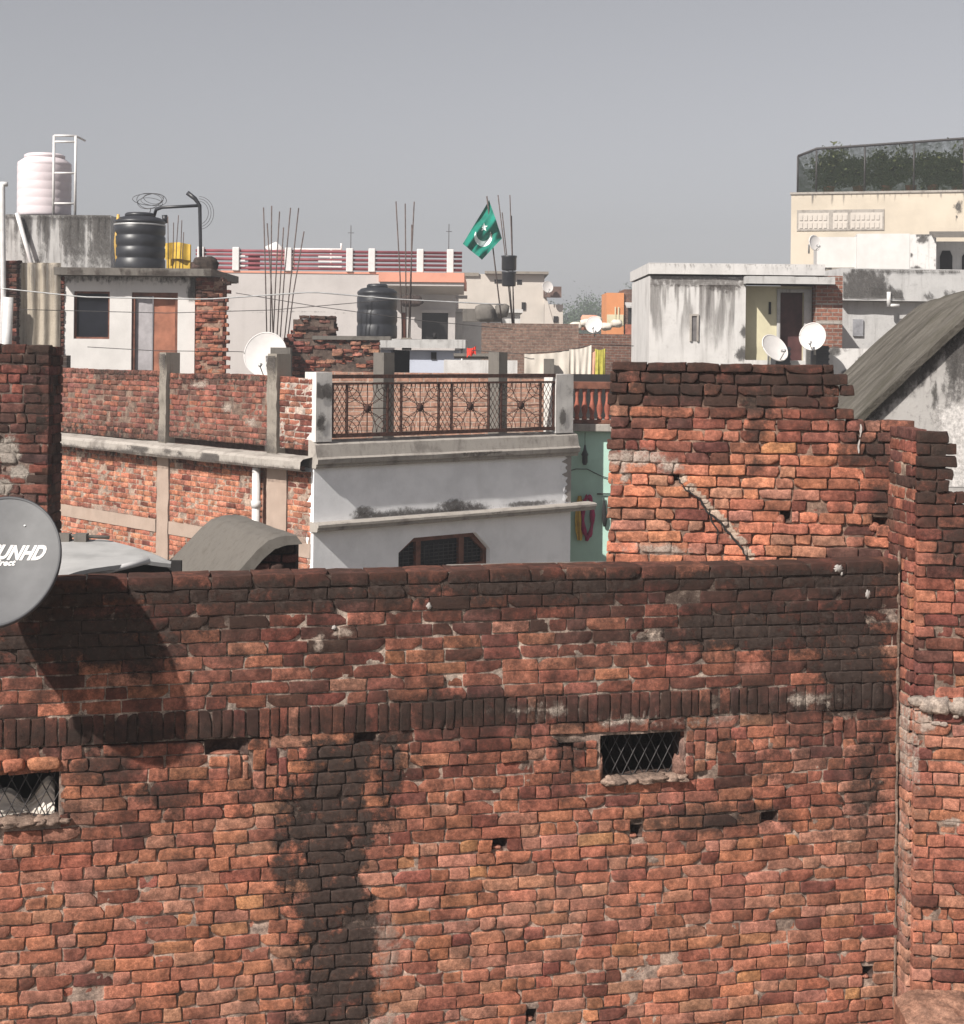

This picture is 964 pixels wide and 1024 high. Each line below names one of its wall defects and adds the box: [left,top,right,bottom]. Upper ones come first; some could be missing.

damp [6,214,143,282]
damp [160,277,195,301]
mould [735,327,746,360]
crack [677,474,755,560]